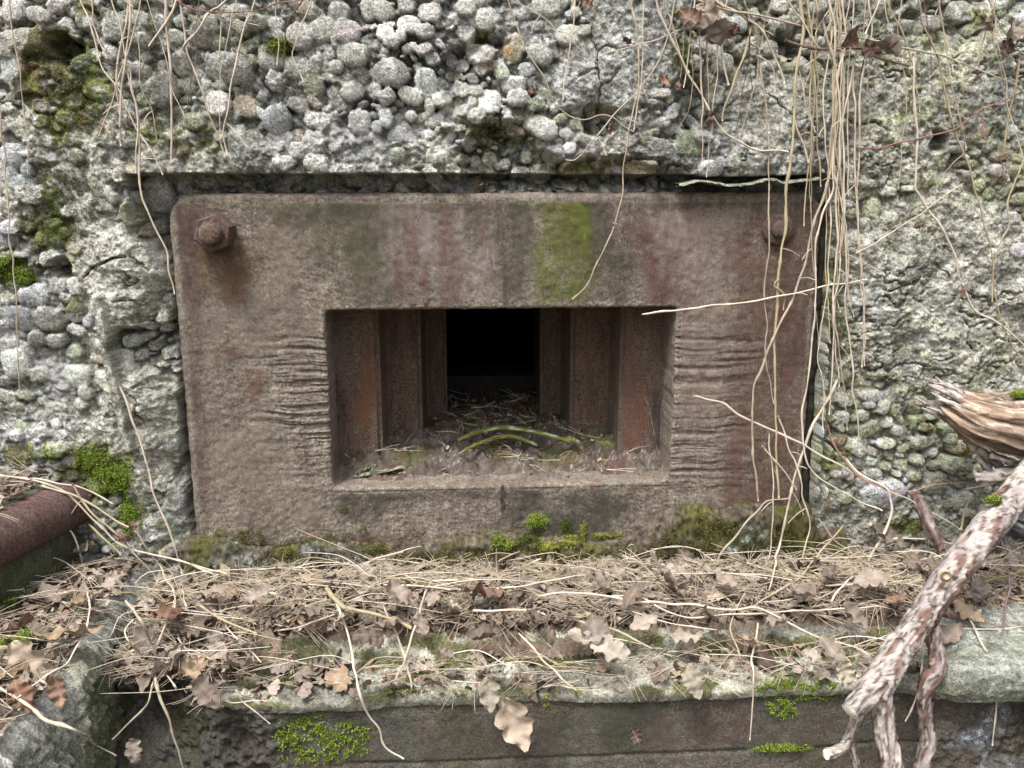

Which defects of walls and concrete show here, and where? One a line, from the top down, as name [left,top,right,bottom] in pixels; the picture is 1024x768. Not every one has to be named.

crack [571,38,619,112]
leakage [259,201,632,303]
rust [722,203,813,507]
rust [353,464,412,478]
rust [458,425,580,455]